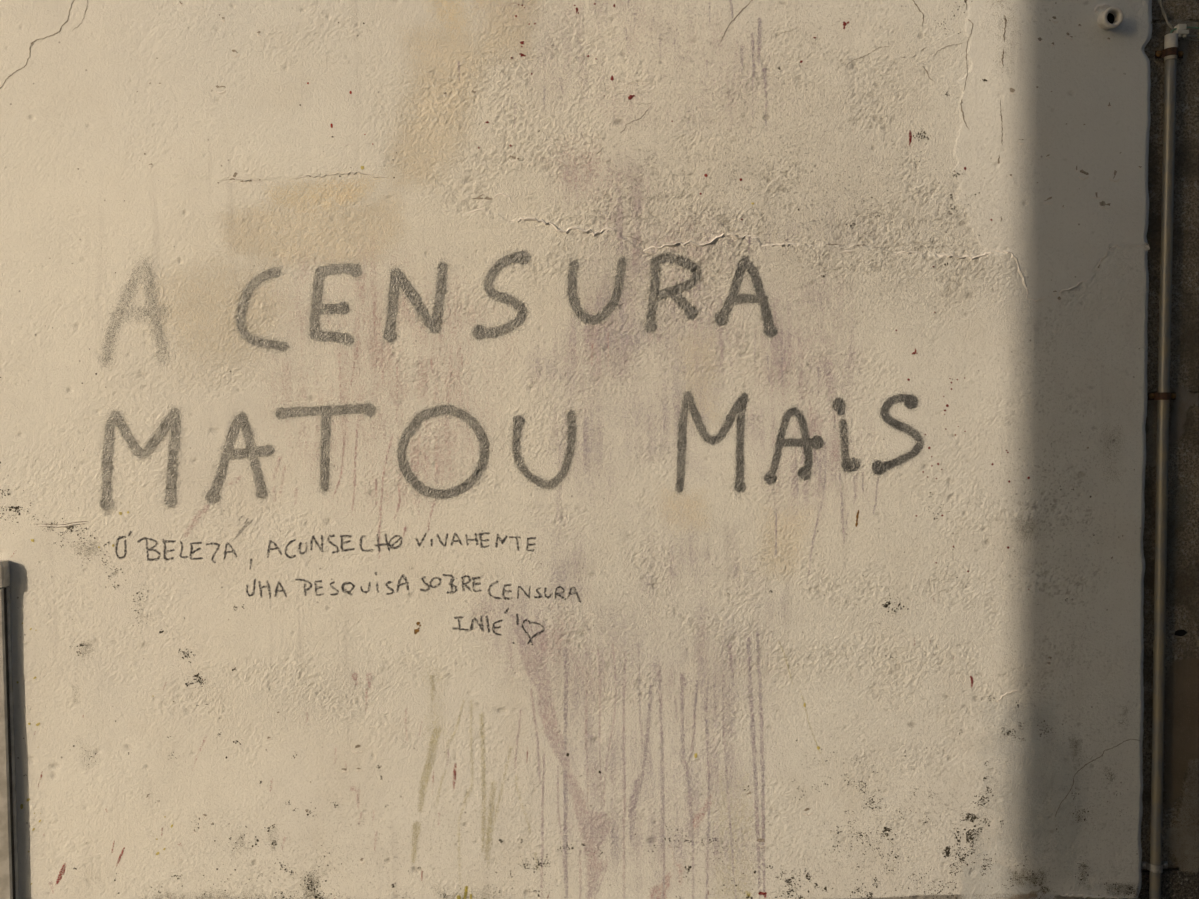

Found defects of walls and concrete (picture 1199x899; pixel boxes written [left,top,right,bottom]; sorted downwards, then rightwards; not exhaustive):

crack [0,0,88,88]
crack [844,0,973,128]
crack [1000,15,1008,66]